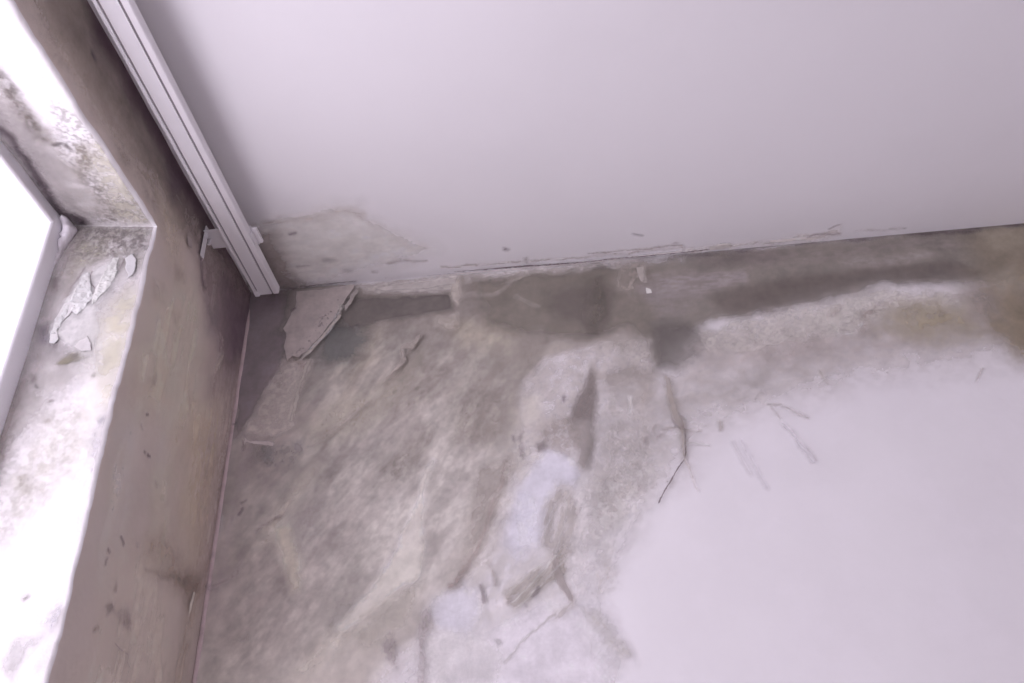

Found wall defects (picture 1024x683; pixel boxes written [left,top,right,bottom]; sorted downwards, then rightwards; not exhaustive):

water stain [34,0,215,246]
water stain [0,74,152,462]
peeling [46,250,137,365]
peeling [243,276,459,462]
water stain [197,218,1024,683]
crack [658,376,688,503]